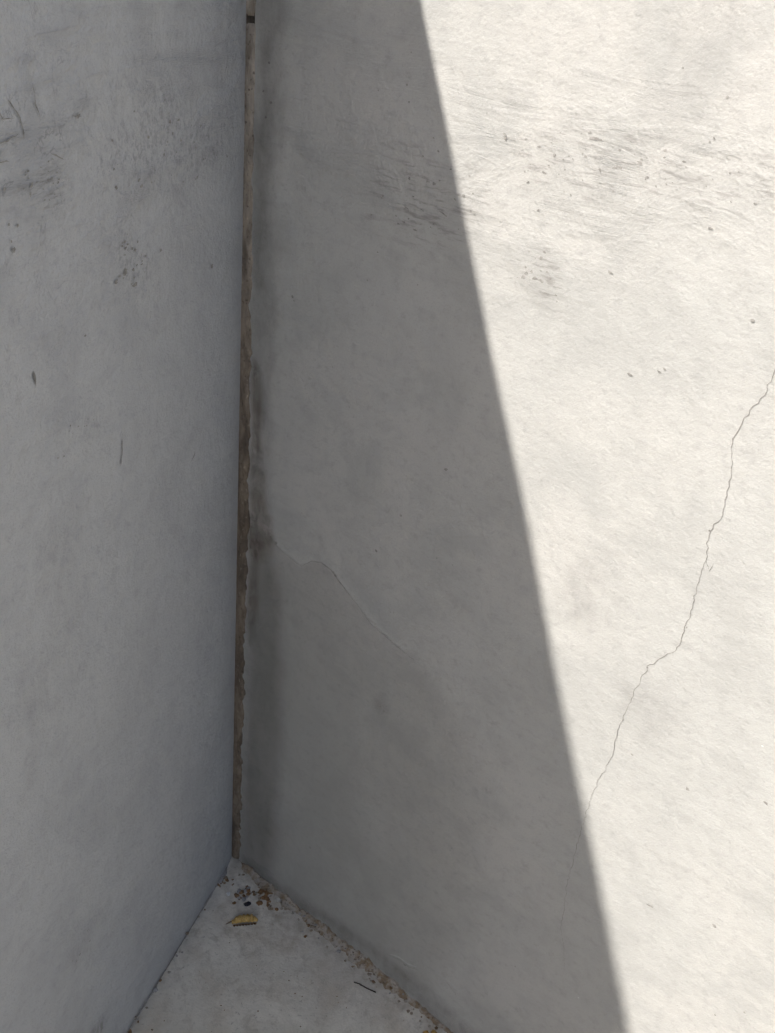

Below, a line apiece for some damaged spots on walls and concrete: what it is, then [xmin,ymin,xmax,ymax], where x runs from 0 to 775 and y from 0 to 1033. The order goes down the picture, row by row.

crack [561,370,775,976]